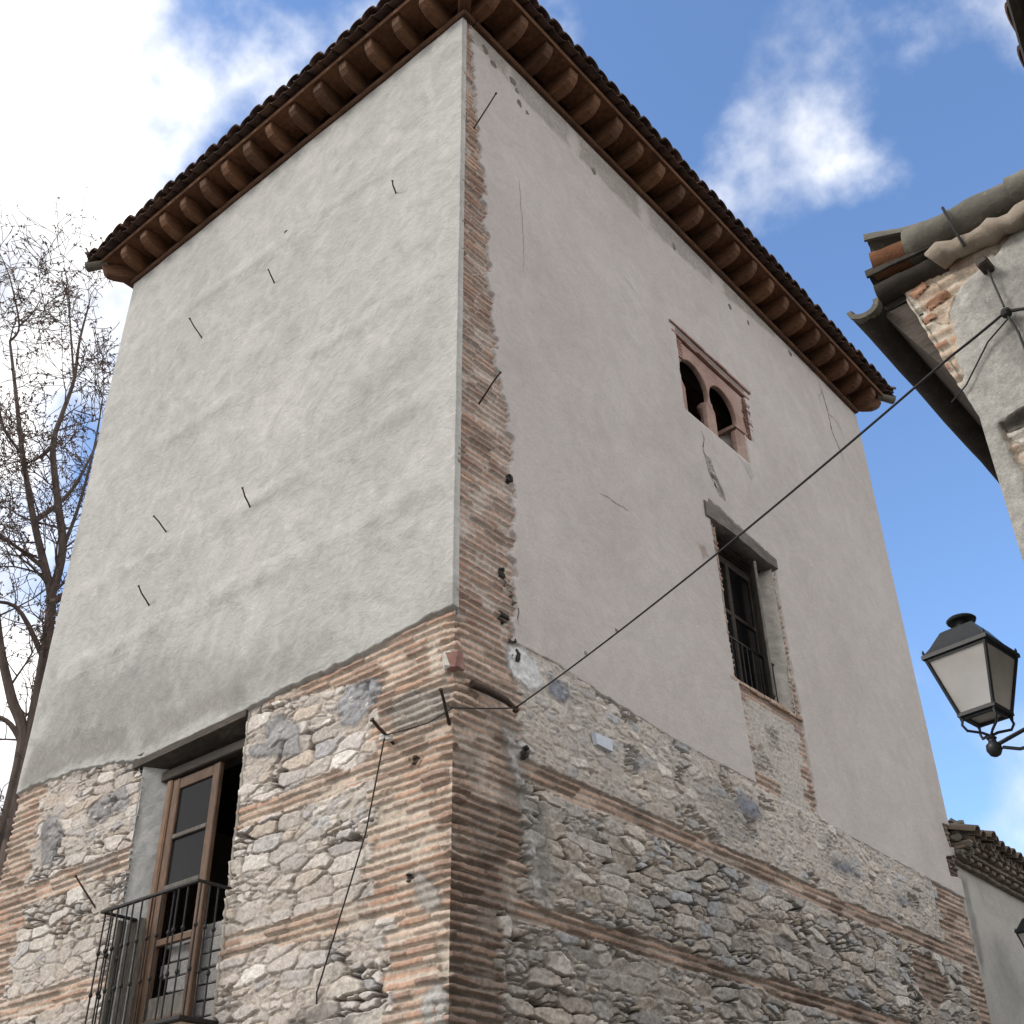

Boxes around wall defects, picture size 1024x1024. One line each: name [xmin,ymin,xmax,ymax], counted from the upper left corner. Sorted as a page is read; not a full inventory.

flaking render [474,34,566,136]
flaking render [581,141,710,279]
flaking render [725,285,773,333]
spalling [908,278,956,325]
flaking render [703,436,726,501]